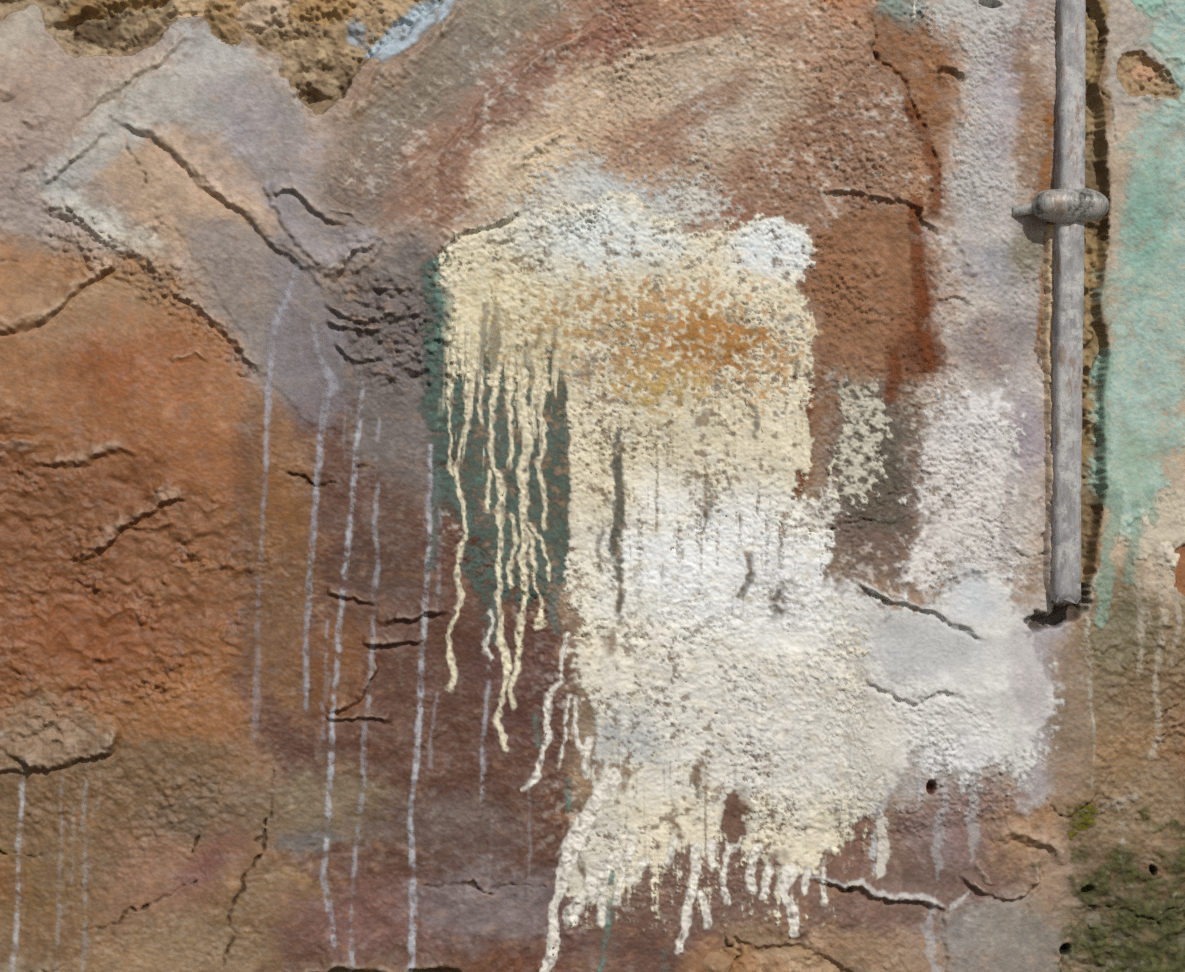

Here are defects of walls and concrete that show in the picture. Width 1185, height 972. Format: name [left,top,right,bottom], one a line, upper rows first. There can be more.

spalling [0,0,443,115]
crack [853,24,923,126]
rust [793,101,958,447]
peeling [1081,0,1185,596]
leakage [305,416,326,645]
leakage [351,390,364,495]
rust [795,463,814,496]
leakage [325,516,352,820]
crack [233,812,272,903]
leakage [321,838,335,941]
leakage [407,689,424,972]
leakage [816,778,969,909]